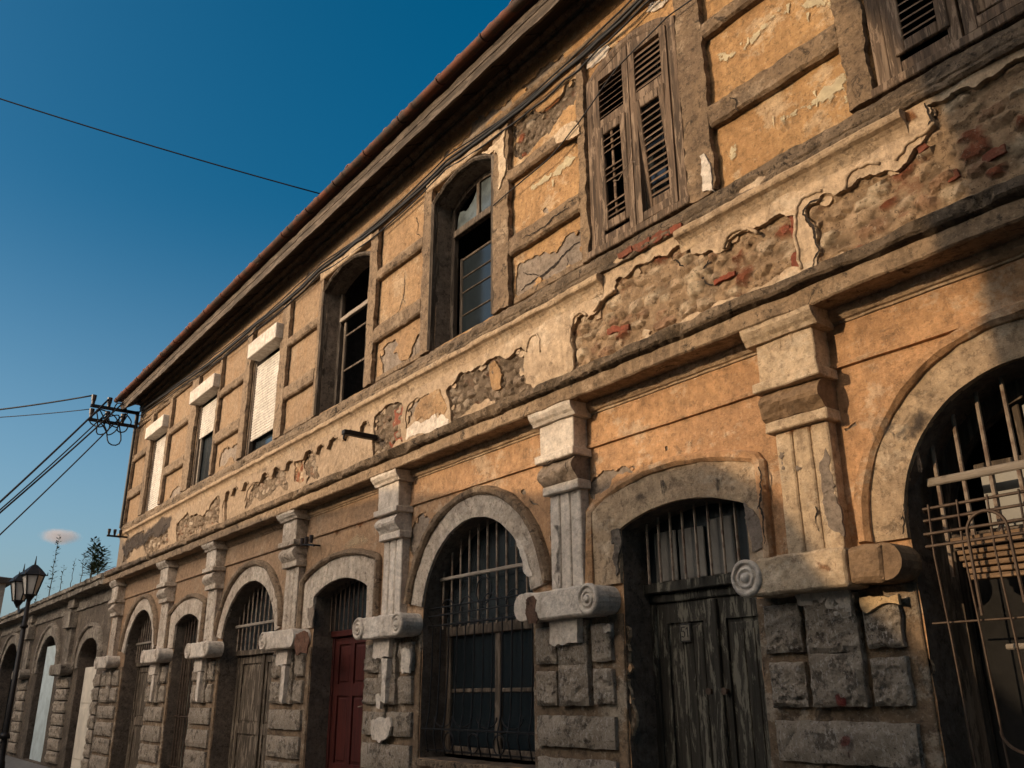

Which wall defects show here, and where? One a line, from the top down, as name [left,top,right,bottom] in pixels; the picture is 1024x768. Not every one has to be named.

flaking render [482,80,581,190]
peeling [700,153,715,192]
peeling [772,70,847,125]
flaking render [809,61,1024,264]
crack [521,242,580,292]
flaking render [573,215,801,369]
flaking render [374,348,533,455]
flaking render [124,496,220,562]
flaking render [246,452,319,509]
flaking render [819,448,846,537]